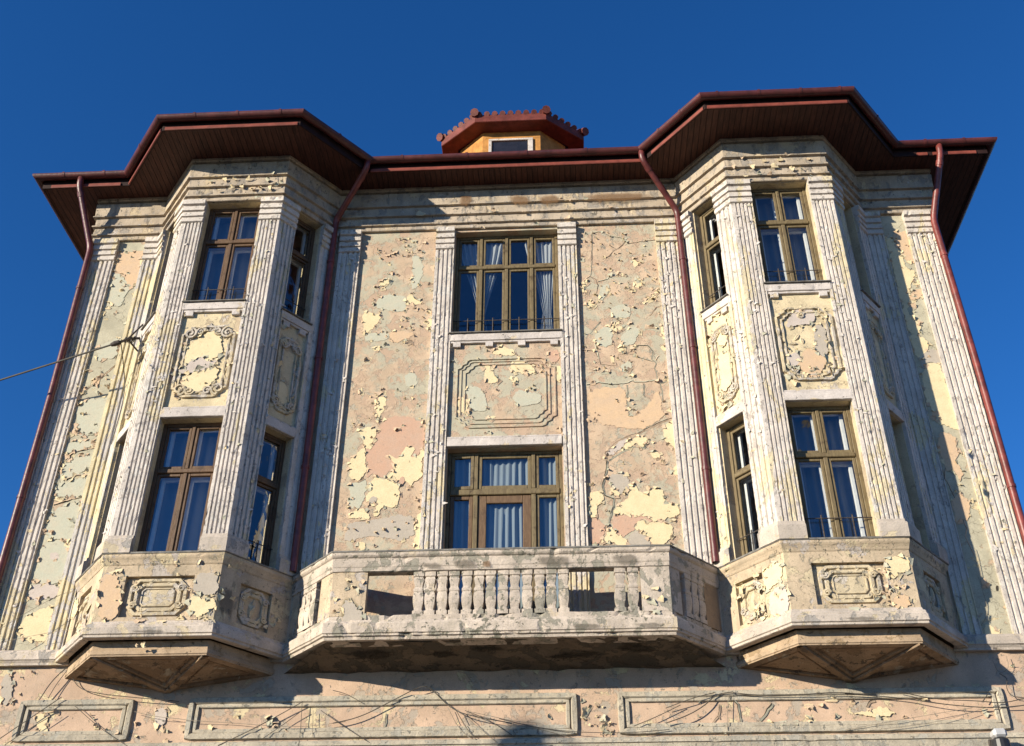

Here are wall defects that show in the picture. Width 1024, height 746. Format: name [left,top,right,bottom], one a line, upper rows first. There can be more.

peeling [12,250,143,643]
peeling [130,293,263,432]
peeling [344,370,447,551]
peeling [457,231,695,546]
crack [582,322,672,527]
peeling [691,277,859,434]
peeling [134,560,235,623]
peeling [736,561,791,624]
peeling [849,552,914,611]
peeling [33,707,60,735]
flaking render [259,715,288,732]
peeling [767,696,908,726]